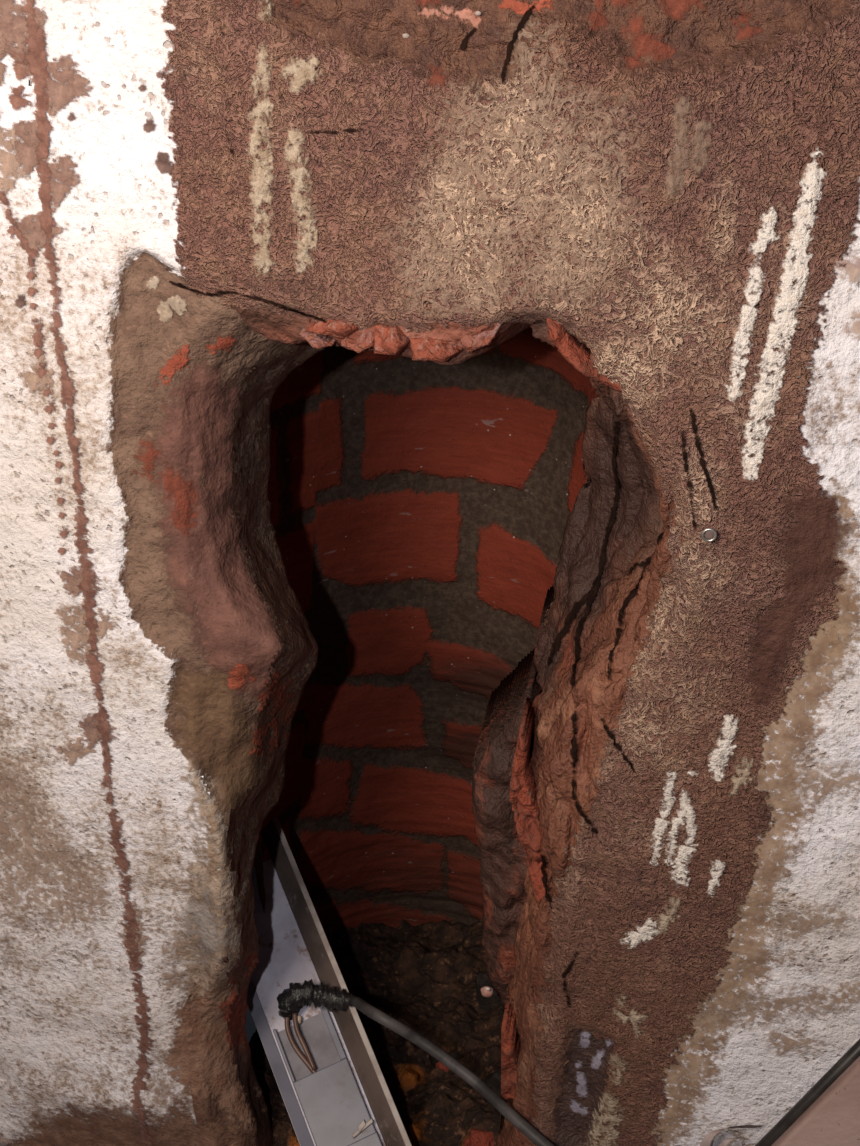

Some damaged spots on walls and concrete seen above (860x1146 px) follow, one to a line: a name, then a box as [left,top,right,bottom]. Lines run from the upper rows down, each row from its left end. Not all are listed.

crack [460,27,476,51]
crack [501,5,534,84]
corrosion [155,152,173,174]
crack [169,281,326,323]
crack [681,408,717,531]
corrosion [0,0,154,1145]
crack [547,421,664,834]
spalling [106,251,686,1146]
damp [0,775,108,930]
damp [648,479,860,1146]
damp [620,898,680,949]